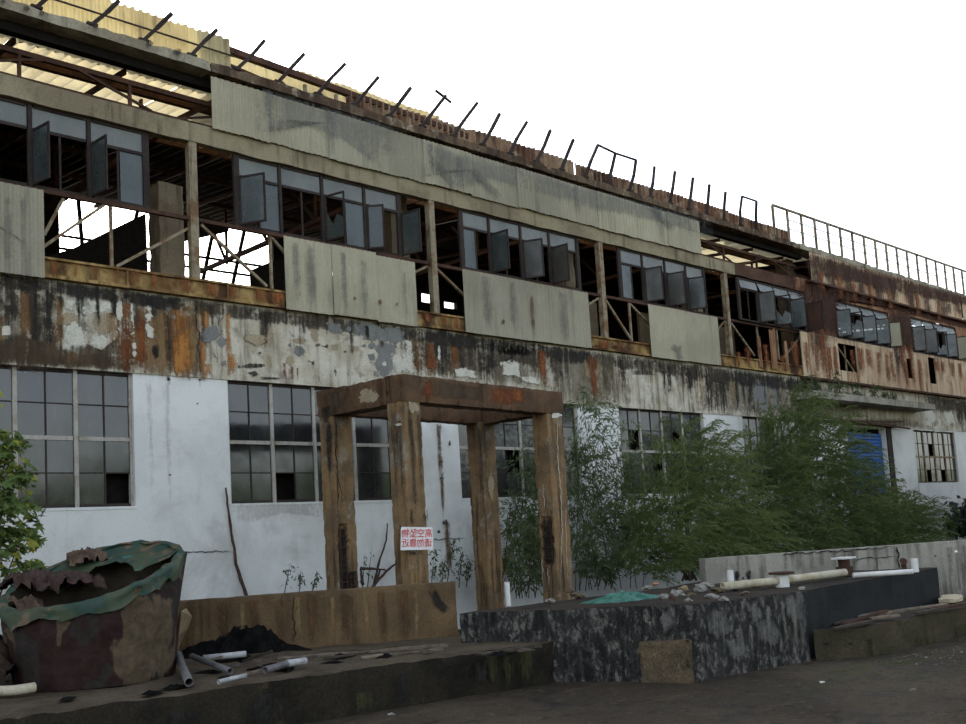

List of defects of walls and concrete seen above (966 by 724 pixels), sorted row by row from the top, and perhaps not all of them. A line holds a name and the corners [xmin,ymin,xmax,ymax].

peeling [55,297,154,357]
corrosion [109,302,211,379]
corrosion [226,314,238,375]
peeling [286,324,319,366]
spalling [331,340,415,403]
damp [0,275,919,428]
corrosion [763,252,966,386]